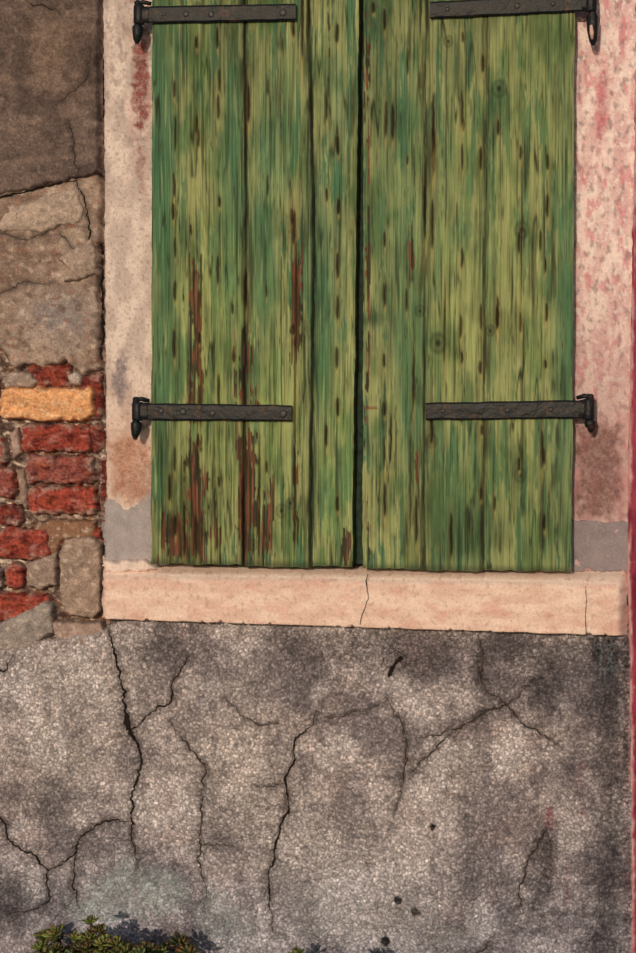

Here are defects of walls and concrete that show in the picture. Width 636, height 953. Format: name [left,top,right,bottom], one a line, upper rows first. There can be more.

crack [0,46,105,360]
spalling [0,165,121,651]
crack [0,631,230,915]
crack [226,635,557,932]